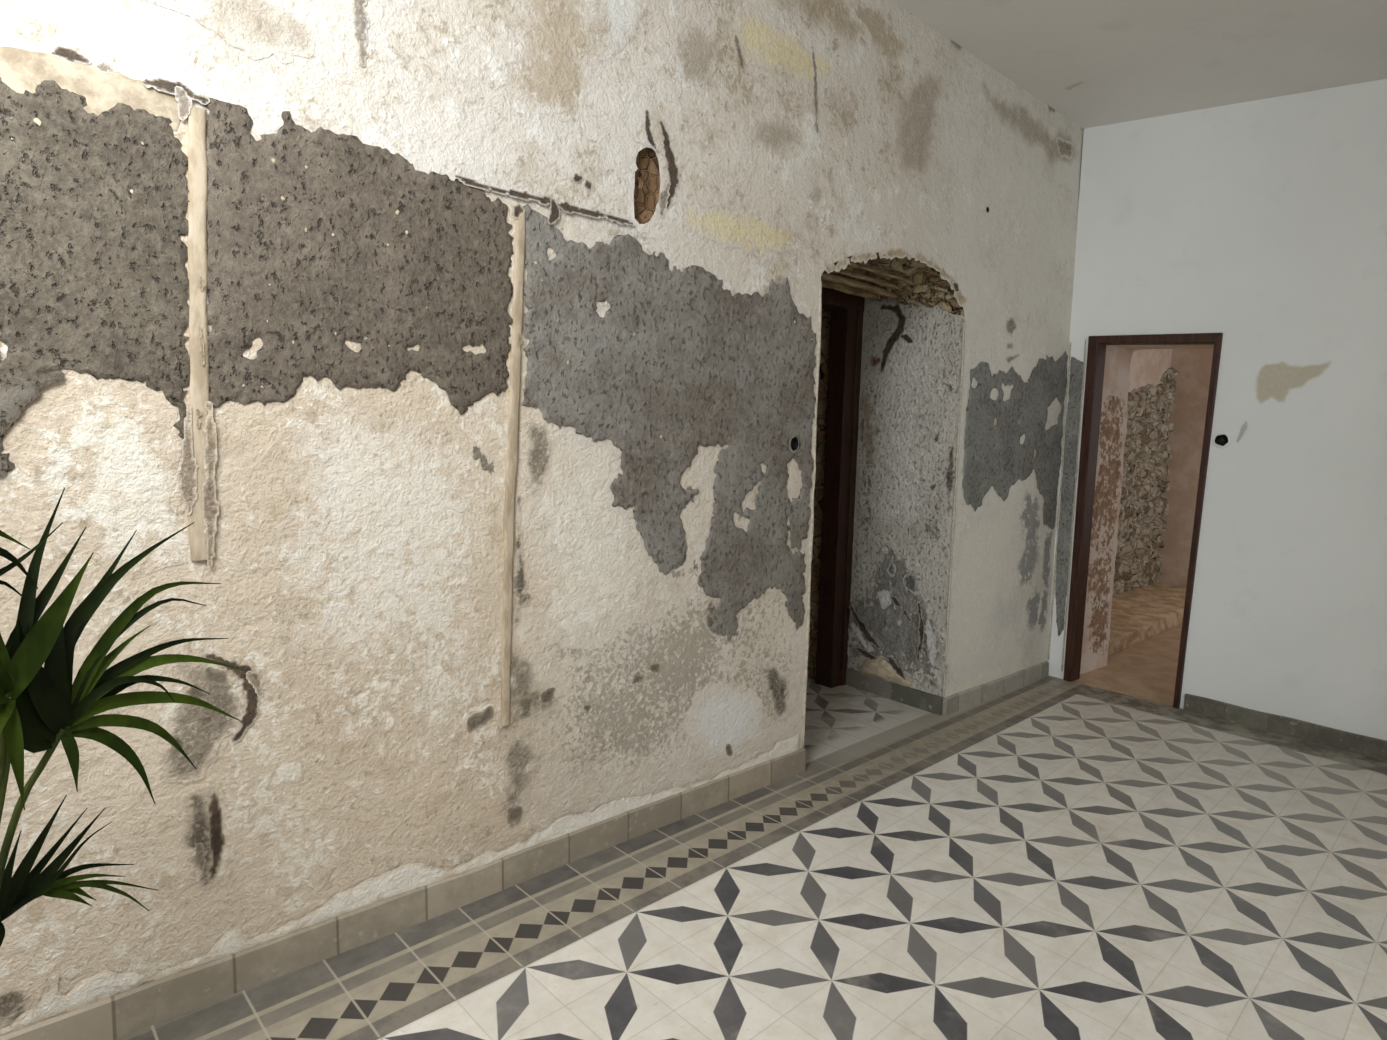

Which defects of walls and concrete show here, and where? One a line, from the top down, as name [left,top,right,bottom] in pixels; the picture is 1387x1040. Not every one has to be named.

peeling [0,47,180,131]
spalling [512,203,525,219]
spalling [1254,360,1332,405]
peeling [0,368,188,575]
peeling [524,419,810,800]